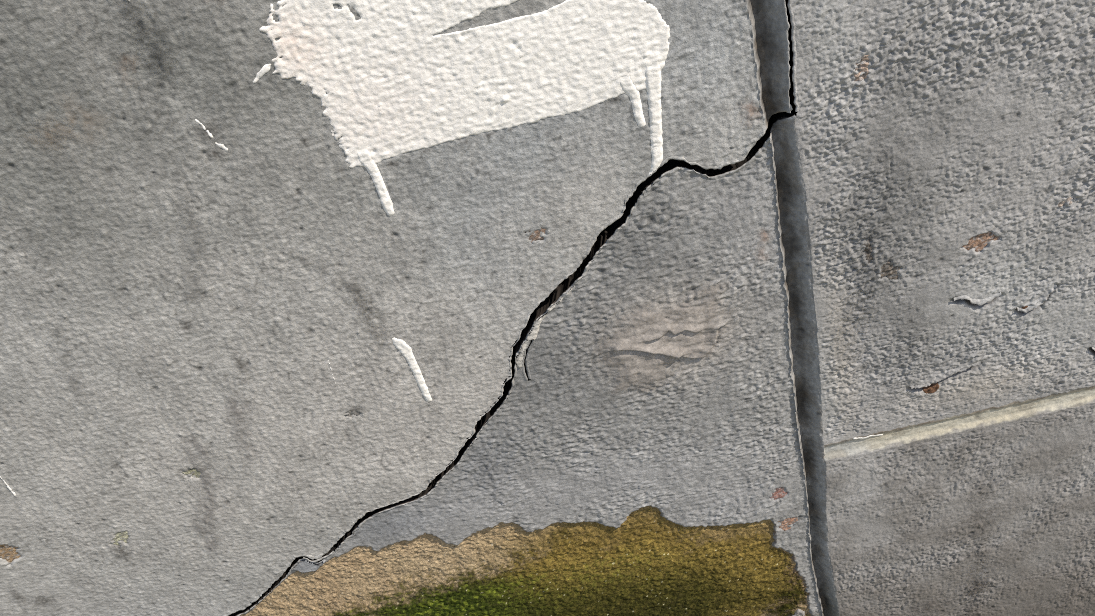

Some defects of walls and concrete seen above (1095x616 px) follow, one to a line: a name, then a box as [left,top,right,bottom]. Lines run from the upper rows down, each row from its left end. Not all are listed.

spalling [962,231,1000,252]
crack [223,0,799,616]
peeling [954,292,1001,306]
peeling [910,361,981,394]
spalling [770,487,788,500]
flaking render [240,506,811,616]